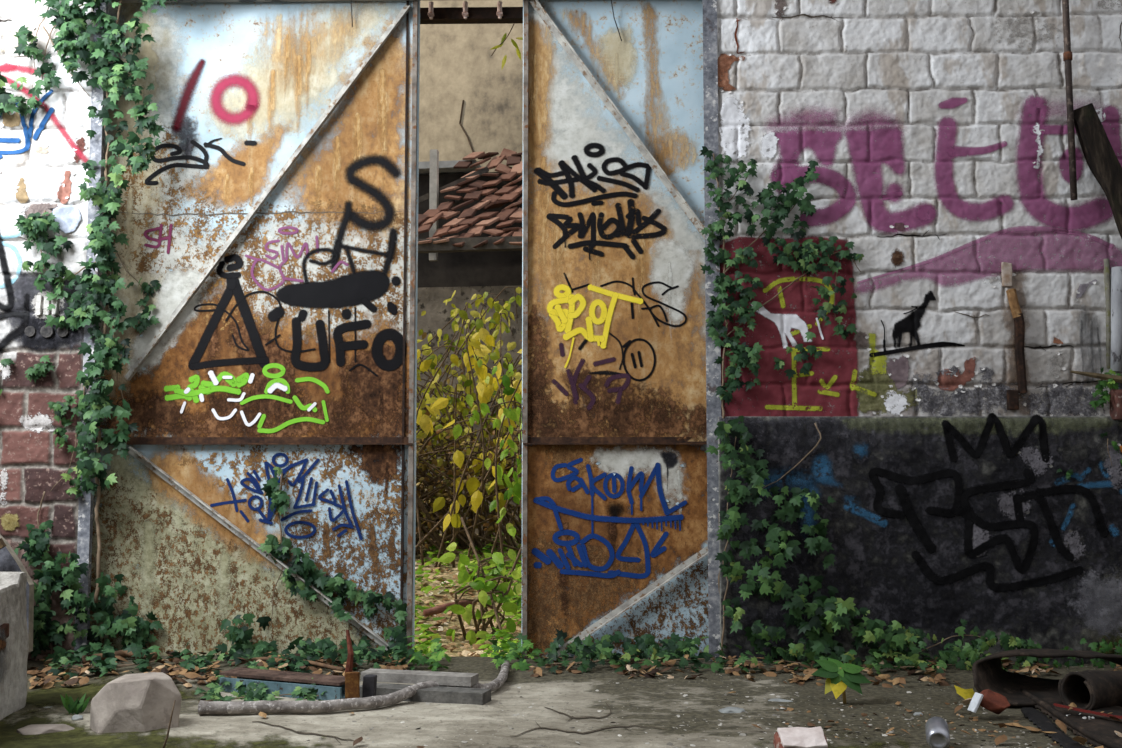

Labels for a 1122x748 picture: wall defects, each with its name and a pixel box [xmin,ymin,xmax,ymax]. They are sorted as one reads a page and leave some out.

corrosion [90,2,417,656]
corrosion [522,2,709,657]
damp [1068,569,1122,643]